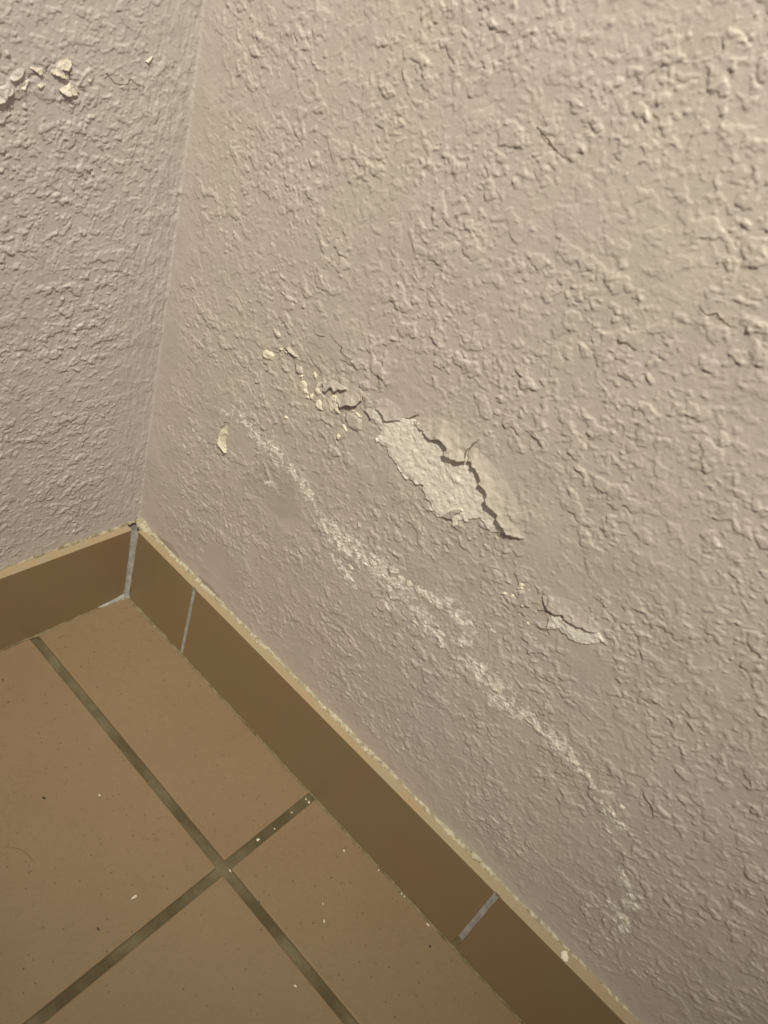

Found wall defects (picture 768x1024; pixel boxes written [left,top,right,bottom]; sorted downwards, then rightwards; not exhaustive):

peeling [0,58,92,104]
spalling [136,517,642,1024]
peeling [262,329,526,540]
water stain [220,404,630,852]